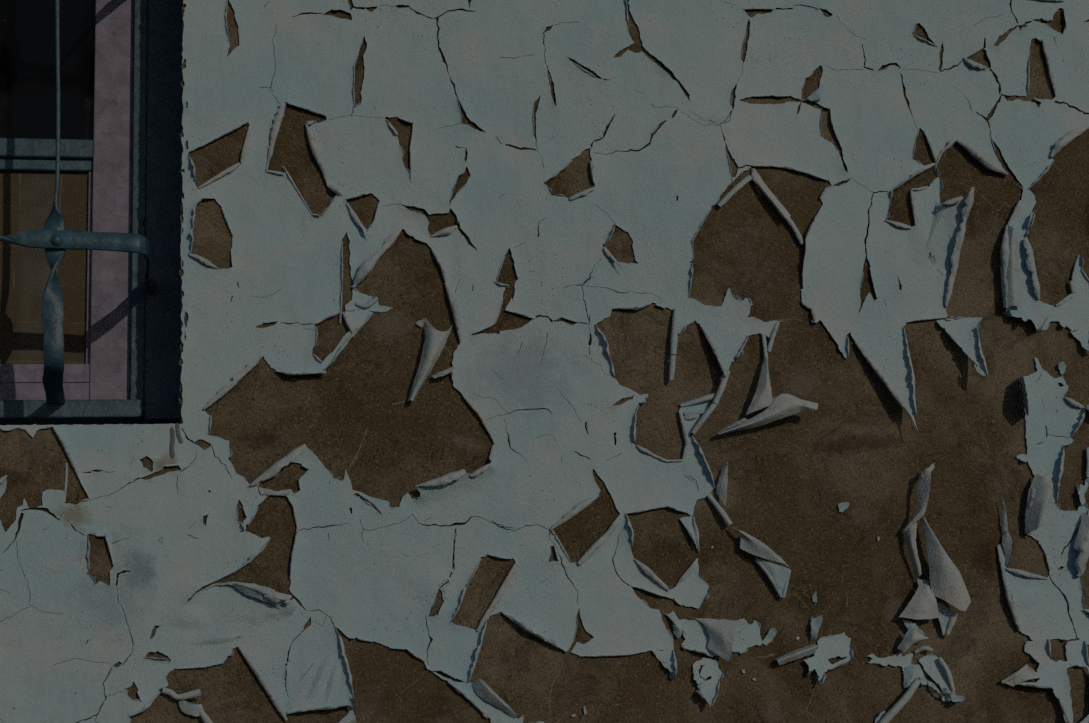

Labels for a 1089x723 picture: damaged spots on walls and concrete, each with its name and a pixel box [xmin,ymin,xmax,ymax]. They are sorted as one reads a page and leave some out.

crack [223,0,239,56]
peeling [266,101,381,236]
crack [292,0,827,177]
peeling [801,65,847,171]
crack [827,31,961,144]
crack [955,0,1089,211]
crack [231,232,353,329]
crack [833,176,901,311]
peeling [0,426,91,532]
crack [3,428,230,558]
peeling [124,116,1089,723]
crack [55,570,161,723]